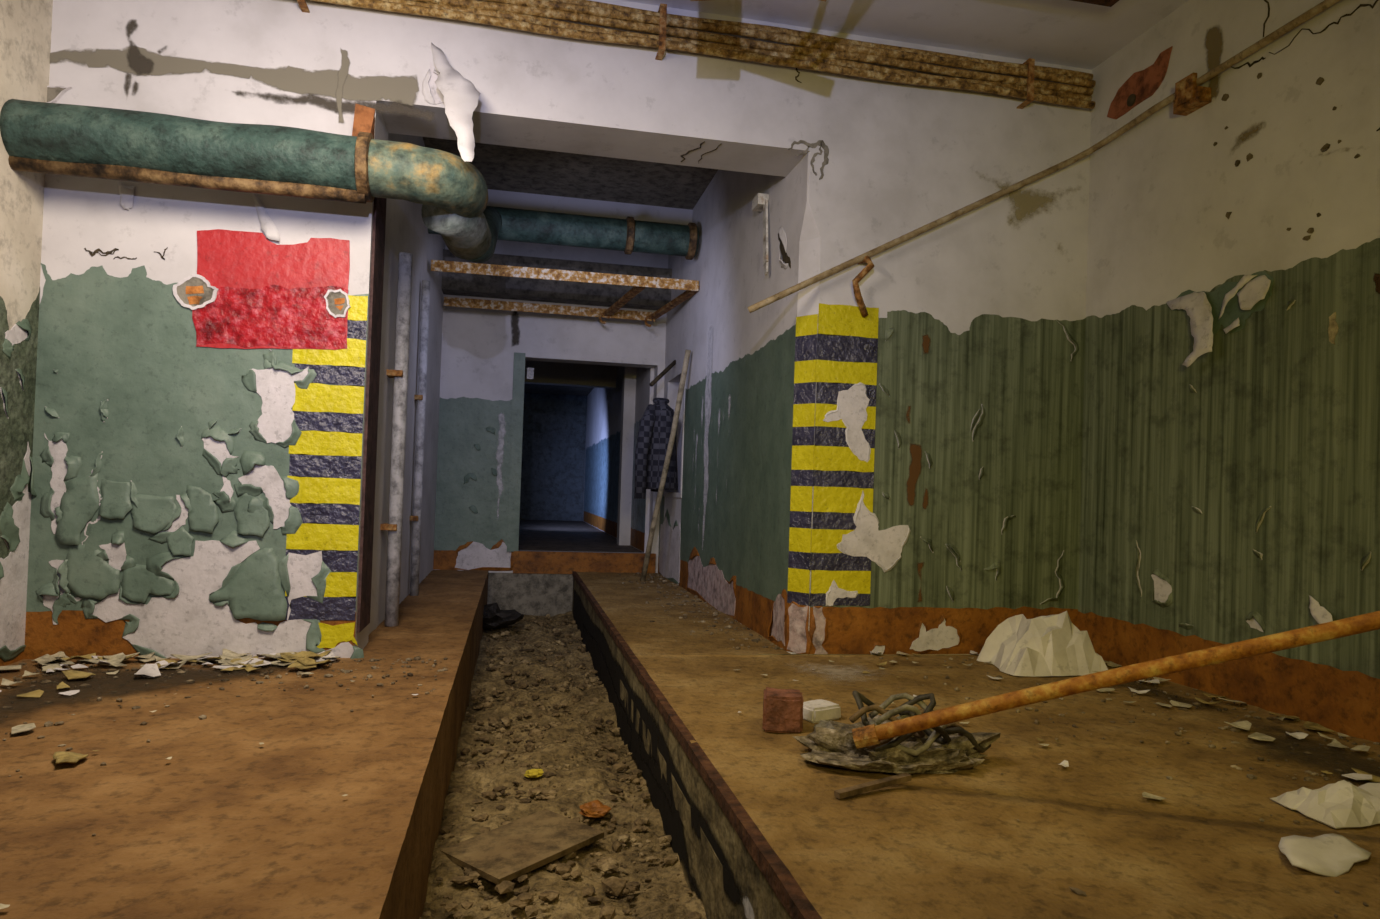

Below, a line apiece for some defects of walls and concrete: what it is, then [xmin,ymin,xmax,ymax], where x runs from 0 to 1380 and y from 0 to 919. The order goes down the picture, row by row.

water stain [50,20,434,123]
peeling [422,62,444,105]
flaking render [173,274,219,310]
flaking render [324,289,351,318]
peeling [2,319,32,390]
peeling [176,349,317,535]
peeling [823,382,890,462]
peeling [0,406,364,662]
peeling [768,580,858,670]